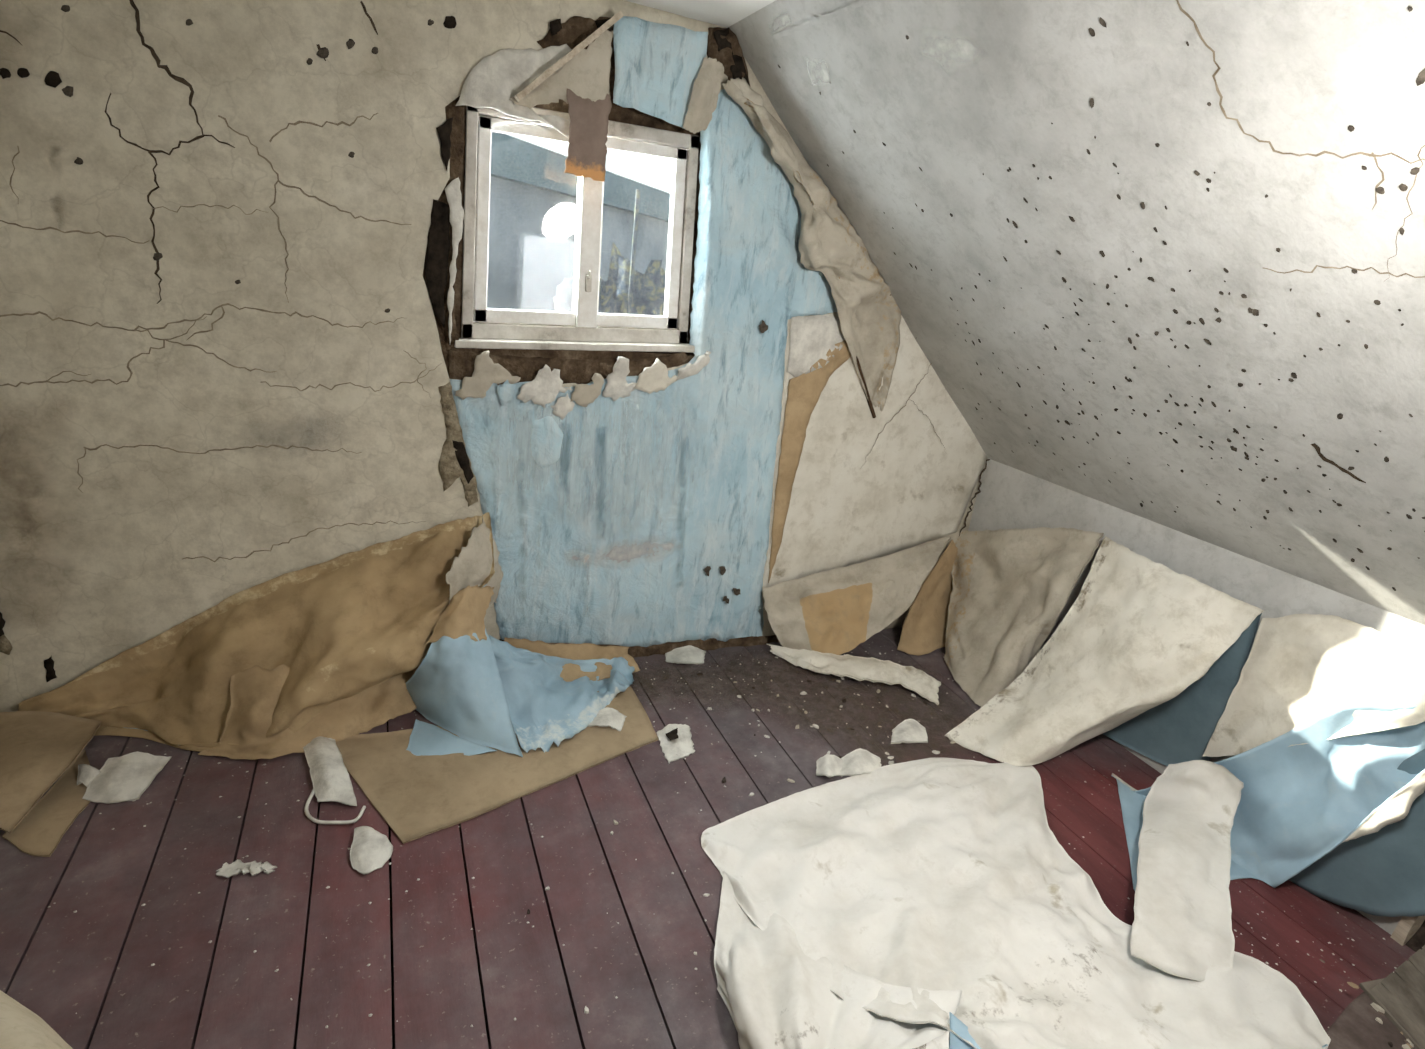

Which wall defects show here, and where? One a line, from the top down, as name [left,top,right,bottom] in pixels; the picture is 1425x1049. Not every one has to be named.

flaking render [707,27,750,86]
crack [0,0,442,398]
flaking render [425,16,690,507]
crack [77,444,361,493]
flaking render [0,612,13,655]
flaking render [598,635,889,743]